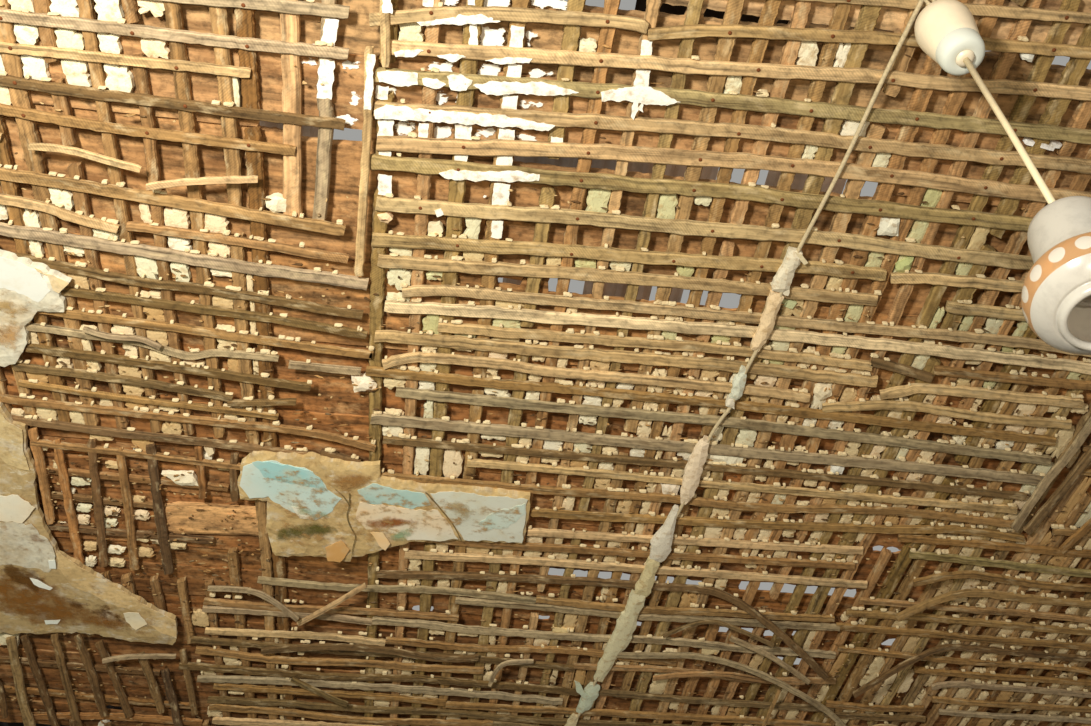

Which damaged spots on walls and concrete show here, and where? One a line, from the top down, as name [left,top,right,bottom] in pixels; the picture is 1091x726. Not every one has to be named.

water stain [0,301,16,342]
water stain [0,567,124,628]
peeling [574,680,592,700]